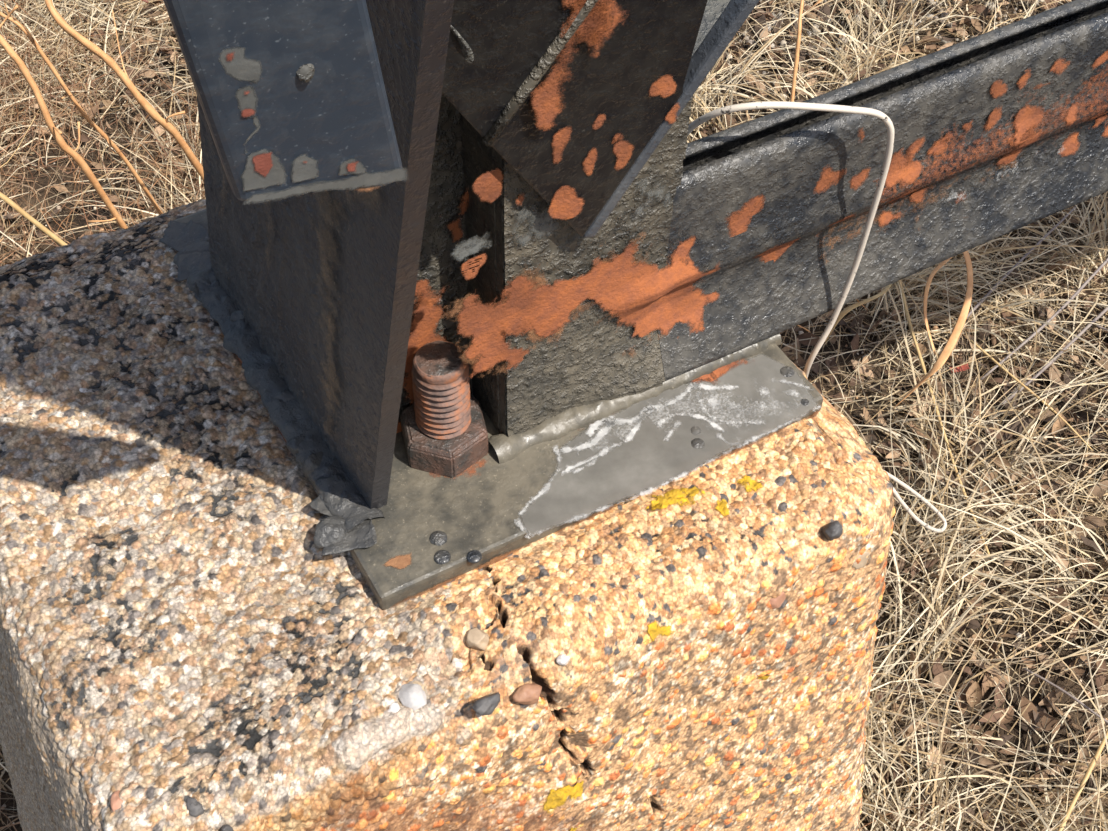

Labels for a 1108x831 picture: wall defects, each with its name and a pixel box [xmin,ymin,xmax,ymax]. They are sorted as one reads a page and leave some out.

rust [879,51,1108,226]
rust [448,169,503,242]
rust [728,196,764,237]
rust [754,238,799,263]
rust [815,168,870,193]
rust [403,234,719,405]
crack [478,655,494,671]
crack [483,566,591,772]